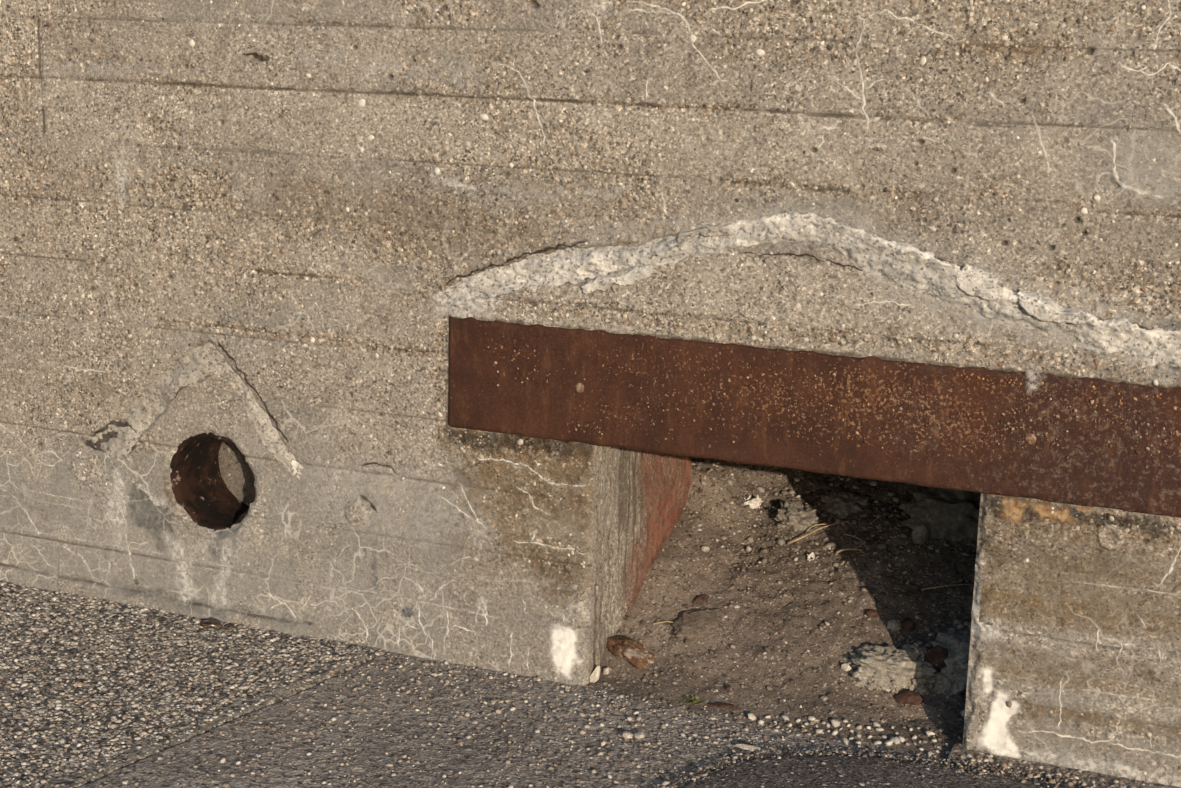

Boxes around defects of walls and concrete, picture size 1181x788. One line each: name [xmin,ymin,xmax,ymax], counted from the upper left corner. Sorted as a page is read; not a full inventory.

spalling [0,0,1181,479]
corrosion [487,340,585,386]
corrosion [445,353,1181,518]
crack [0,423,227,587]
crack [397,557,529,670]
crack [478,458,586,555]
spalling [483,479,590,511]
spalling [518,524,585,576]
corrosion [990,494,1110,527]
spalling [1044,506,1139,545]
crack [1148,547,1181,594]
crack [1020,618,1181,758]